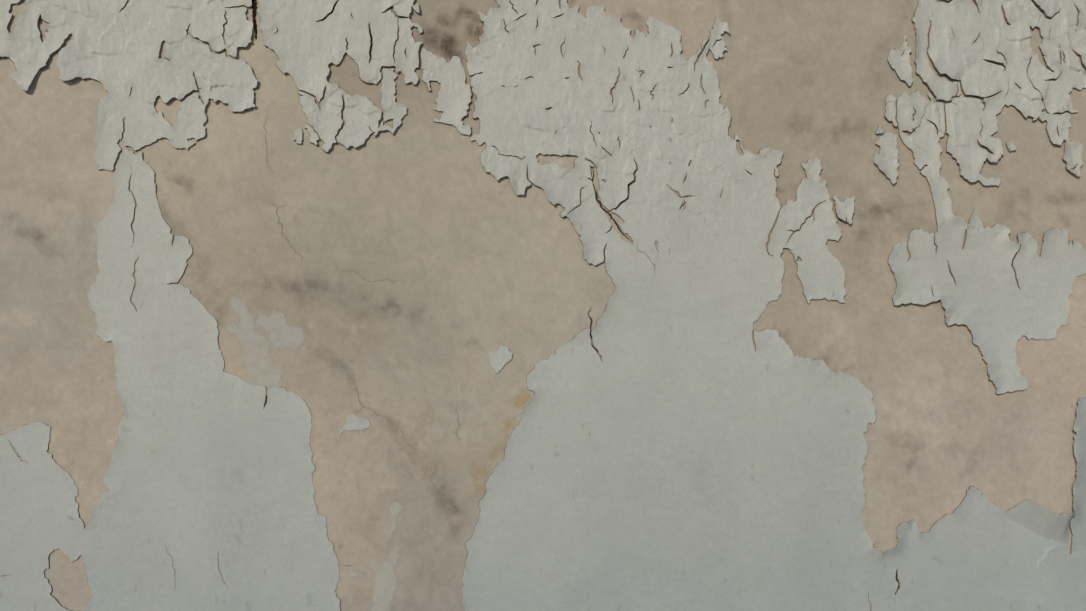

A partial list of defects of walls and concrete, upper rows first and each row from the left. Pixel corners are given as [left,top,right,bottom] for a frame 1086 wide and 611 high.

peeling [0,0,452,611]
crack [250,0,258,39]
peeling [257,0,1086,611]